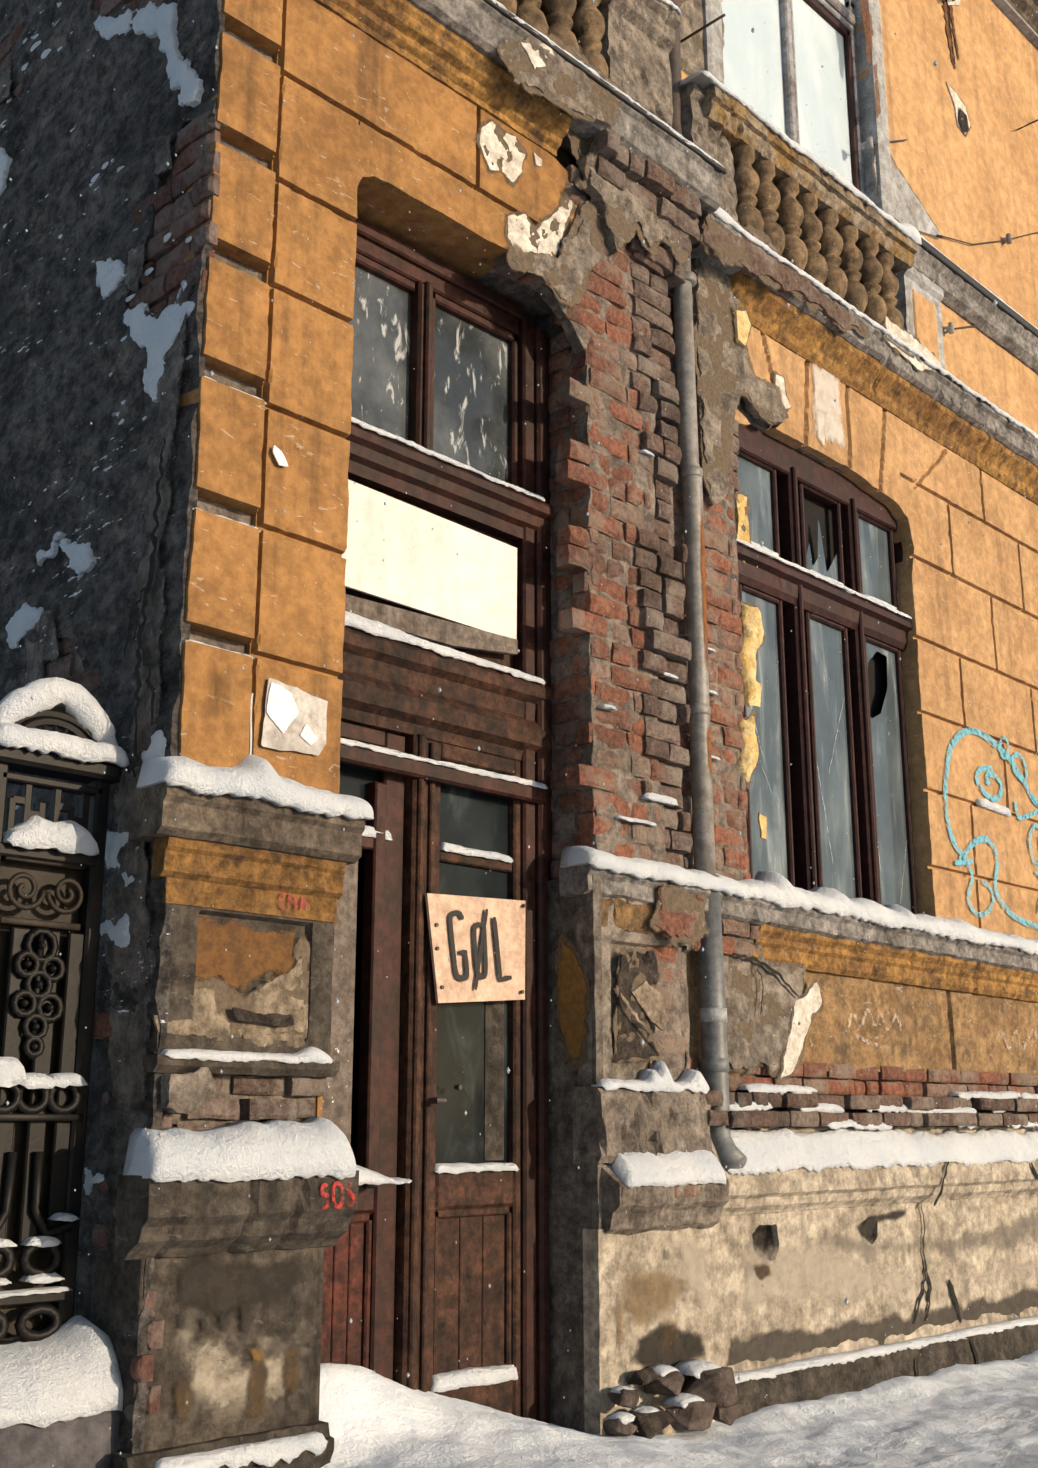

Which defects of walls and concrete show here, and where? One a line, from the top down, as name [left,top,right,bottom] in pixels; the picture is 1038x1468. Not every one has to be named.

spalling [679,0,724,75]
corrosion [943,0,959,69]
flaking render [475,119,542,187]
flaking render [494,33,944,1085]
flaking render [93,107,326,1131]
crack [732,953,800,1015]
hole [752,1225,775,1279]
water stain [746,1244,929,1302]
hole [859,1210,906,1243]
crack [913,1161,979,1377]
water stain [635,1325,705,1367]
water stain [727,1265,1038,1367]